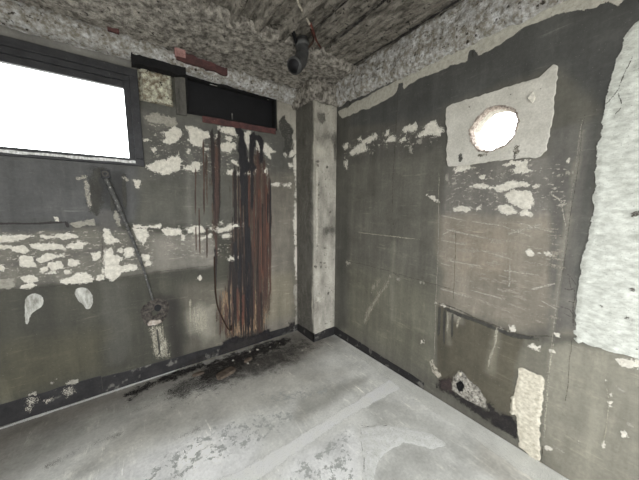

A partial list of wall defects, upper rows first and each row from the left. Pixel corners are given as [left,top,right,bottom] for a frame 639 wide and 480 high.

peeling [338,0,623,118]
peeling [143,113,276,177]
peeling [335,120,445,170]
peeling [426,158,574,217]
spalling [573,21,639,370]
peeling [0,211,243,290]
rust [194,129,273,342]
water stain [148,324,171,359]
spalling [510,368,565,463]